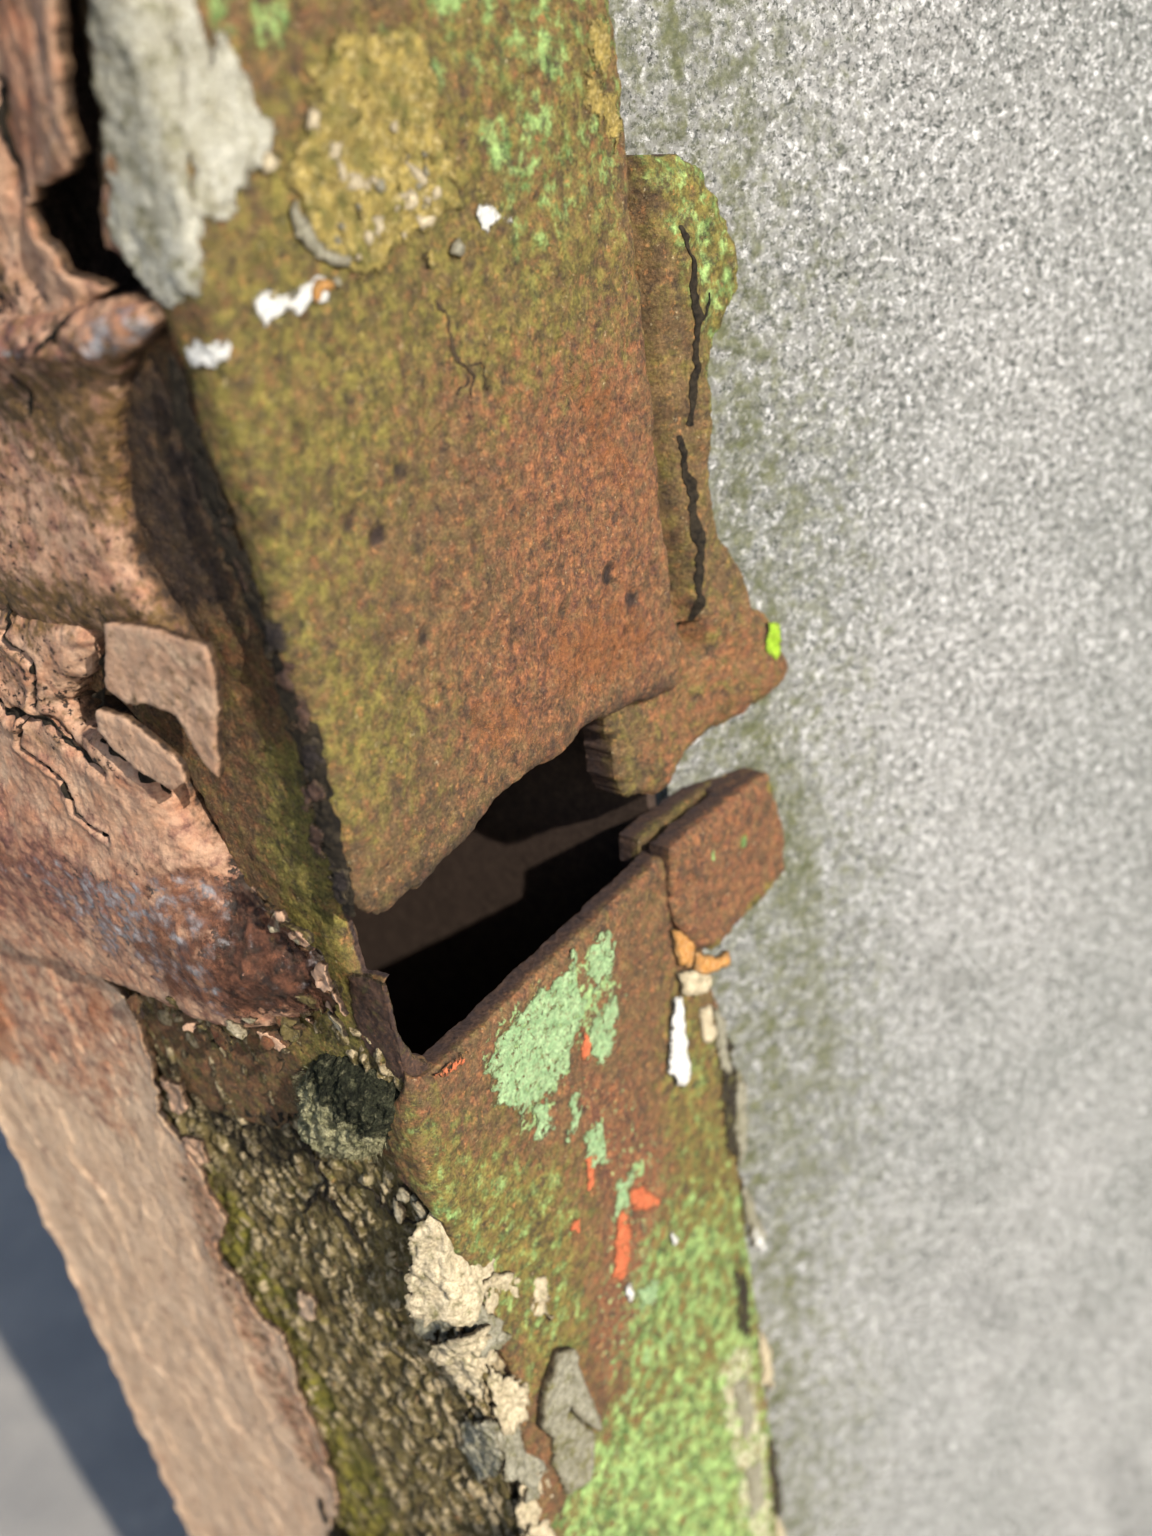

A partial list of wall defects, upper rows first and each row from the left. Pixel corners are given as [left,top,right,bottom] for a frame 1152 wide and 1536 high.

peeling [0,0,279,316]
crack [676,225,711,631]
peeling [96,619,225,790]
rust [134,868,349,1073]
peeling [160,1075,191,1115]
peeling [182,1134,212,1166]
peeling [297,1288,318,1321]
spalling [393,1184,556,1536]